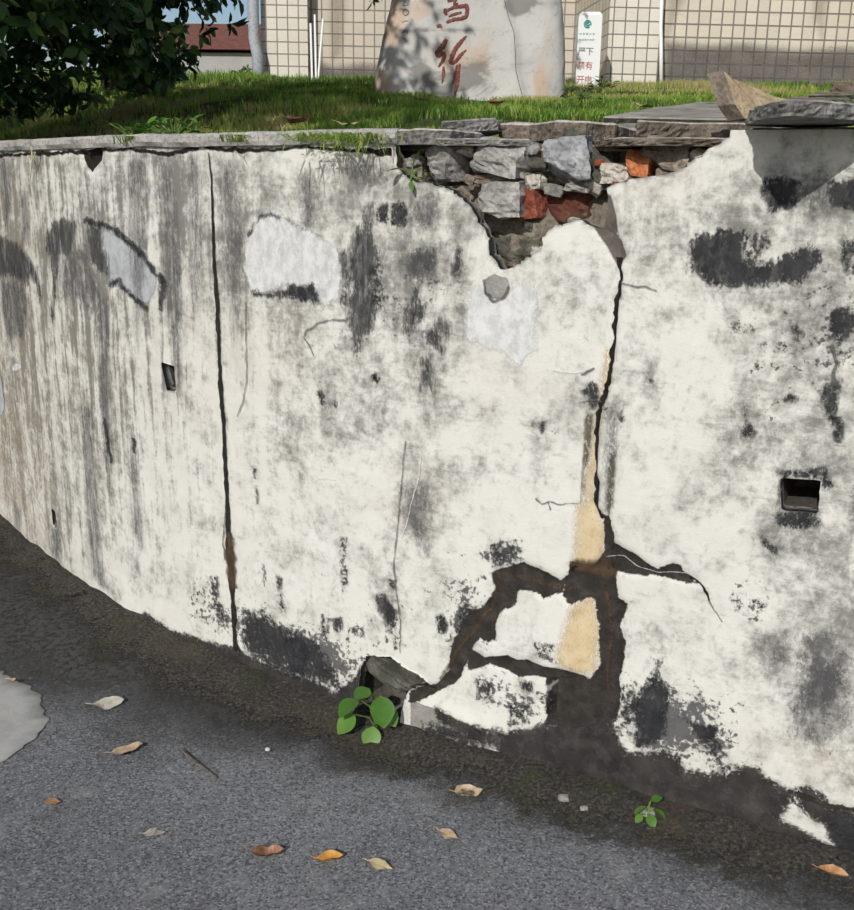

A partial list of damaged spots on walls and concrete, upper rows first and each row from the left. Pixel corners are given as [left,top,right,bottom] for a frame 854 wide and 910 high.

peeling [83,217,166,312]
peeling [244,213,341,307]
flaking render [595,194,626,263]
water stain [688,227,823,289]
water stain [761,176,854,213]
water stain [0,197,112,490]
crack [0,144,391,652]
water stain [819,306,854,443]
crack [408,257,722,729]
water stain [376,579,397,650]
flaking render [364,666,491,749]
water stain [466,660,854,852]